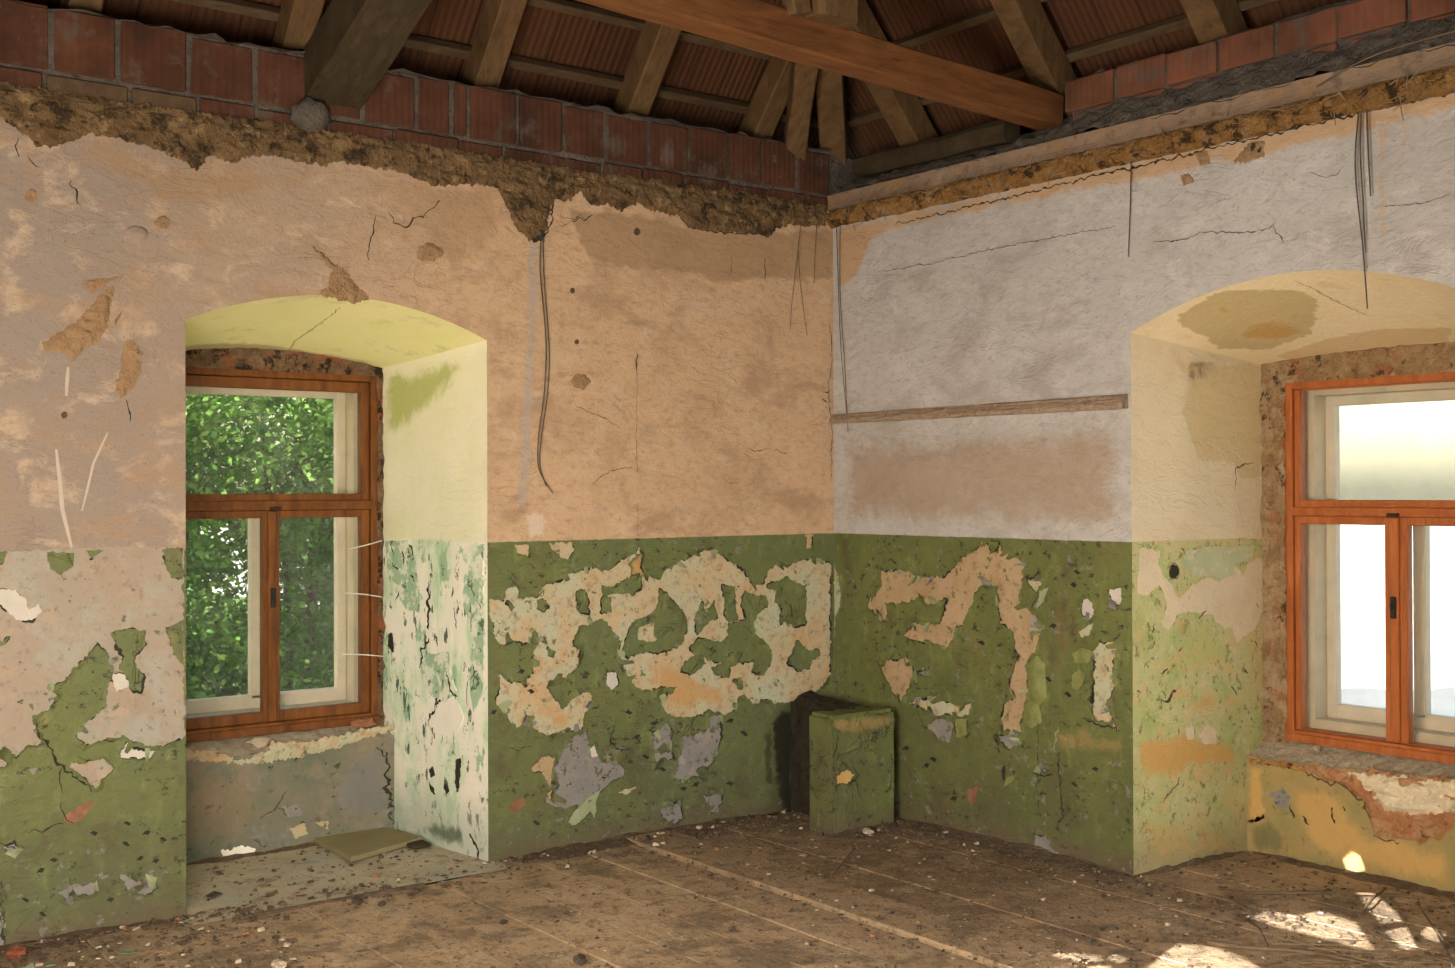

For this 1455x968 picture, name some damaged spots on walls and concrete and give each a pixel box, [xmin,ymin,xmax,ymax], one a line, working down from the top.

flaking render [0,81,828,243]
flaking render [42,276,122,361]
flaking render [310,246,369,304]
flaking render [115,339,144,398]
leakage [1170,288,1455,484]
peeling [385,539,421,613]
peeling [867,463,1263,787]
peeling [0,546,395,839]
peeling [419,534,844,828]
flaking render [1248,757,1455,844]
peeling [0,838,25,858]